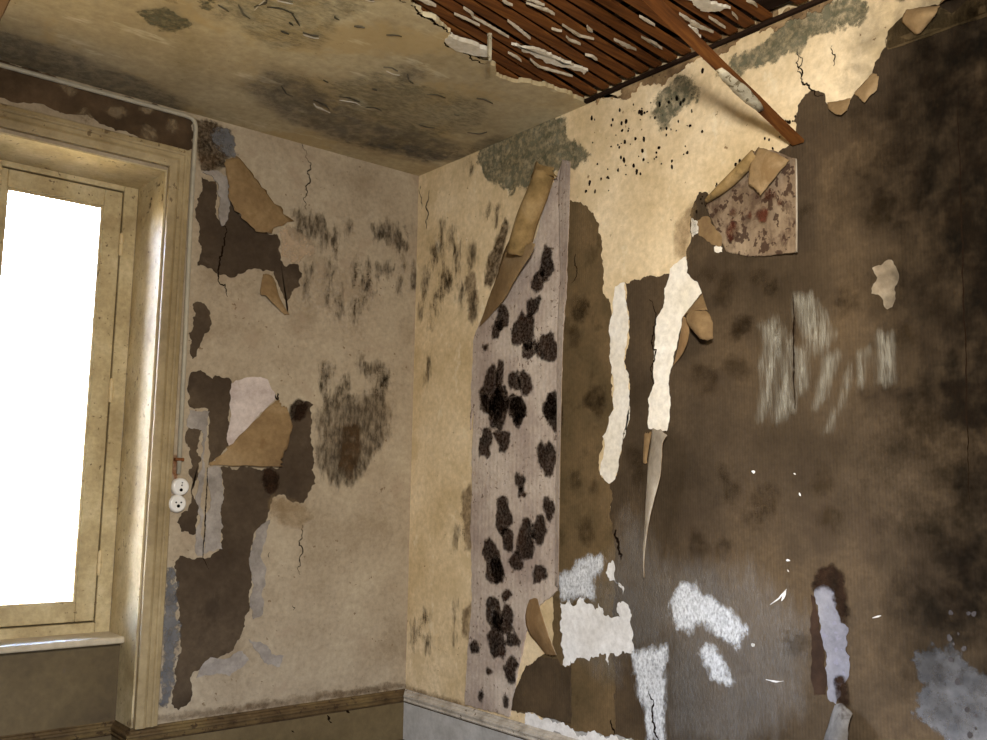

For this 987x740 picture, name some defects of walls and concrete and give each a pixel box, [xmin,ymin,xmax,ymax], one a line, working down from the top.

spalling [412,0,704,105]
water stain [470,75,703,195]
spalling [663,0,833,56]
crack [796,52,823,97]
peeling [195,178,302,311]
peeling [189,302,212,359]
water stain [479,245,557,459]
water stain [537,391,563,477]
water stain [874,0,987,740]
peeling [171,370,315,710]
water stain [470,472,555,684]
peeling [810,565,850,705]